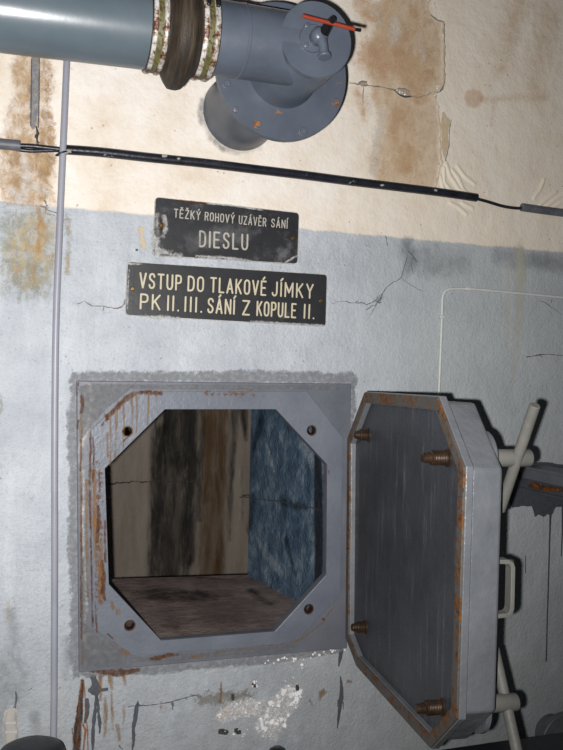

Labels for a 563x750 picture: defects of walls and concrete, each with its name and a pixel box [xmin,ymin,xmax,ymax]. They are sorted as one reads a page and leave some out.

water stain [0,56,57,204]
crack [349,82,432,106]
flaking render [427,0,451,187]
water stain [1,211,54,296]
crack [77,300,125,311]
crack [333,251,423,315]
corrosion [102,390,161,426]
corrosion [80,438,114,633]
corrosion [73,680,88,750]
peeling [213,648,346,742]